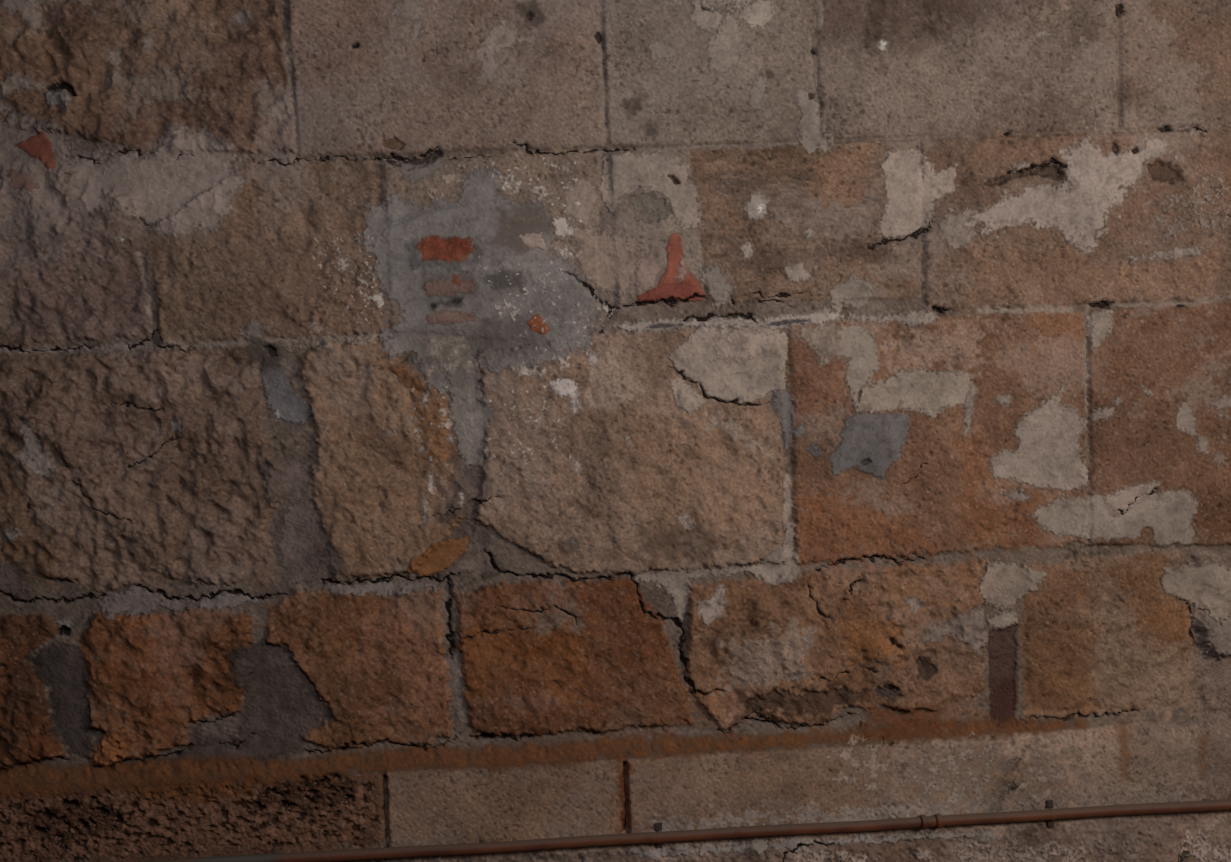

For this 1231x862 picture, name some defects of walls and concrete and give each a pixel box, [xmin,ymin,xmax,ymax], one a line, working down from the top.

crack [253,155,374,166]
crack [447,142,636,160]
flaking render [417,235,475,262]
flaking render [519,232,546,249]
crack [867,221,933,251]
peeling [939,208,977,252]
flaking render [527,313,549,334]
peeling [798,273,882,366]
peeling [1103,481,1160,514]
crack [0,590,105,604]
crack [136,584,291,602]
crack [322,552,721,696]